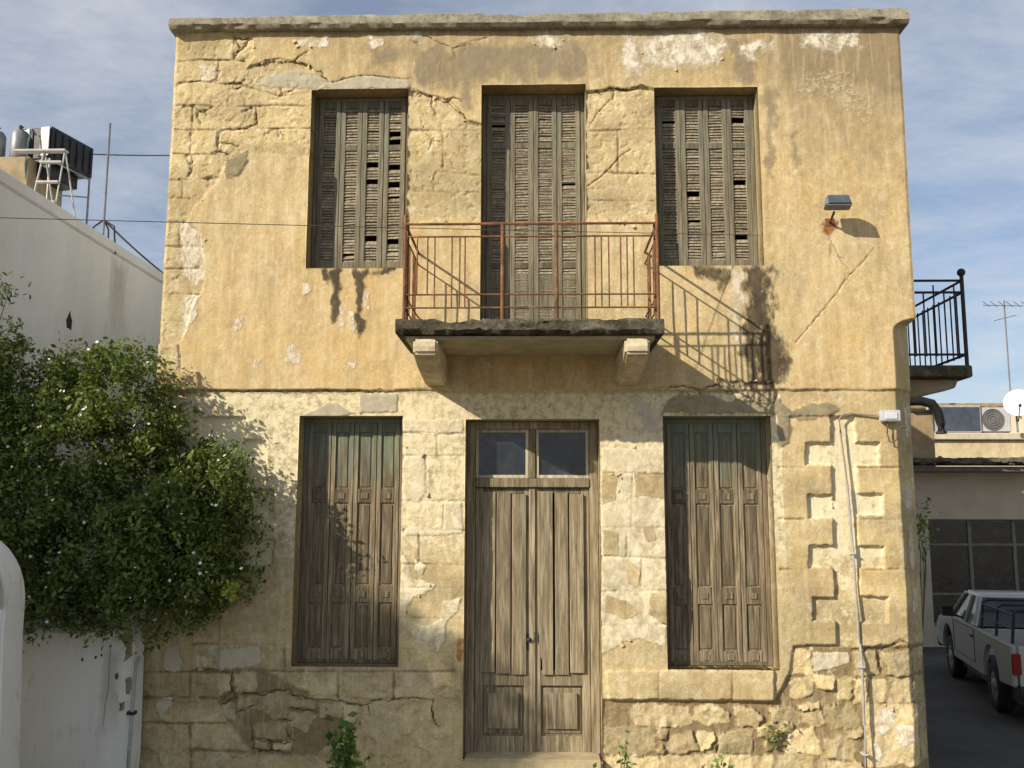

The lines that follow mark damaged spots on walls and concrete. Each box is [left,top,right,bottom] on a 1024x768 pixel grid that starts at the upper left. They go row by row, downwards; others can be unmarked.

peeling [740,40,774,61]
peeling [802,31,860,53]
crack [183,36,479,183]
crack [590,84,651,119]
flaking render [157,32,329,372]
peeling [339,293,370,332]
damp [322,267,395,335]
damp [693,265,731,290]
damp [739,265,792,388]
crack [795,218,875,342]
peeling [400,552,461,652]
crack [192,668,439,754]